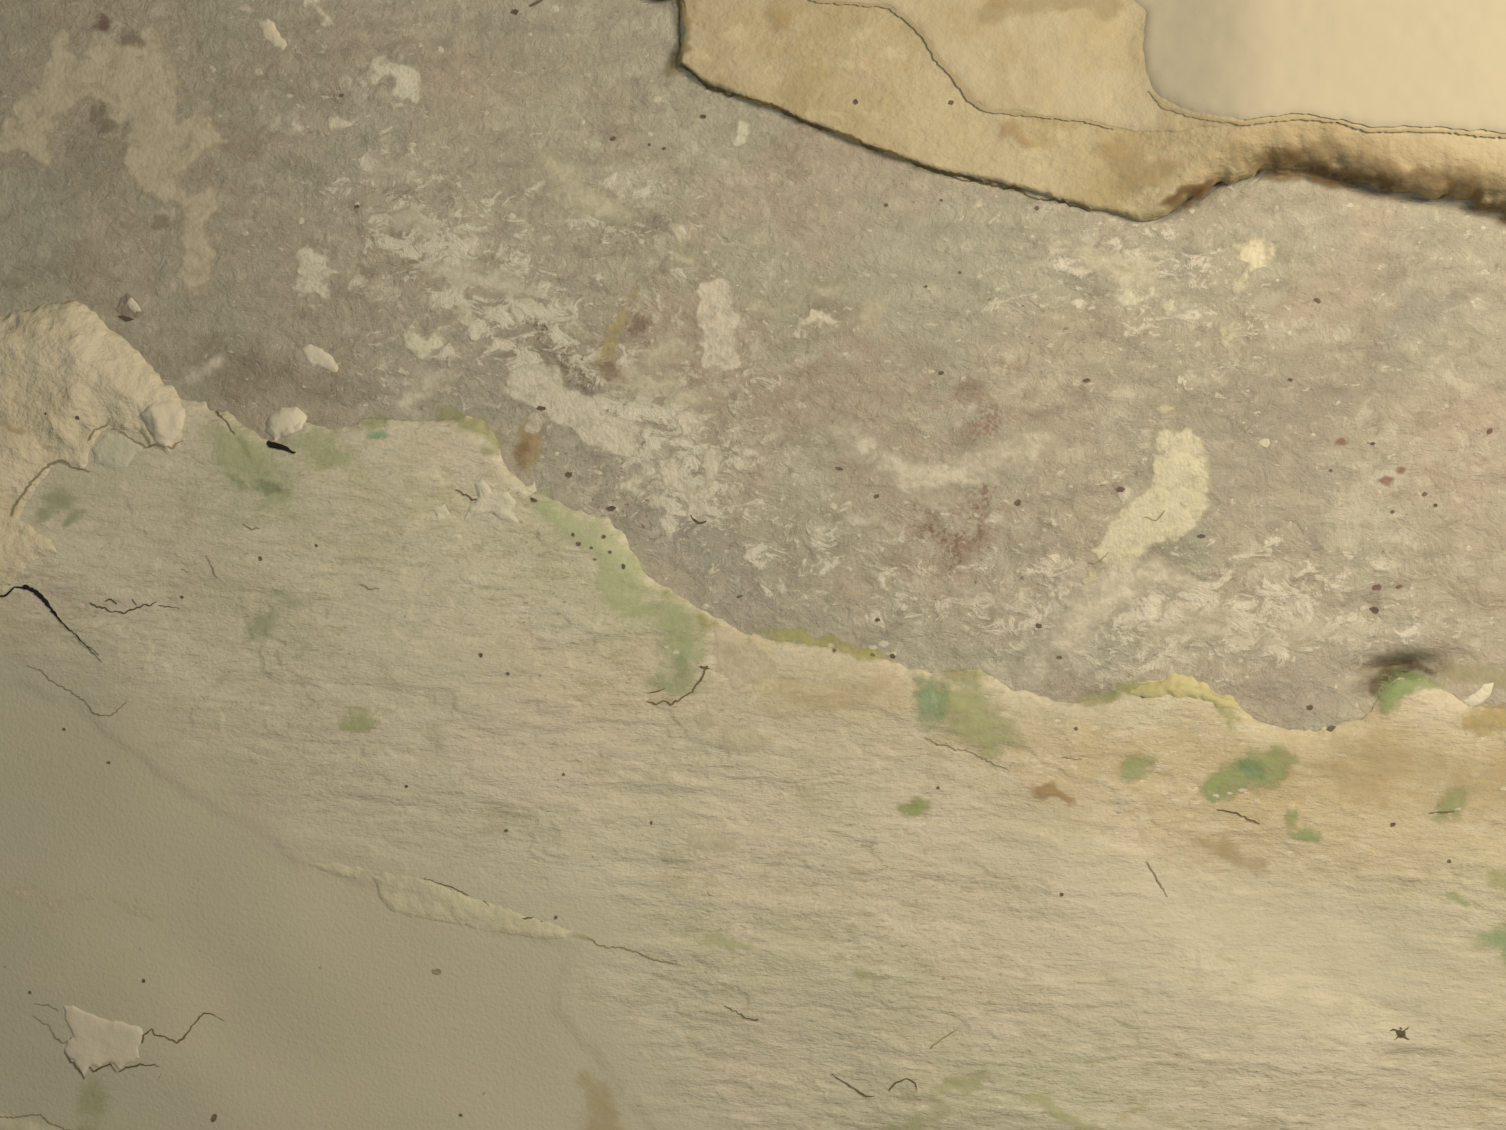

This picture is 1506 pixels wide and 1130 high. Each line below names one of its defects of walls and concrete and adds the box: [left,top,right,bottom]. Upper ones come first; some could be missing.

water stain [1163,178,1215,207]
water stain [1262,140,1506,220]
spalling [0,0,1506,732]
crack [0,585,179,663]
crack [647,666,710,706]
peeling [33,1003,223,1079]
crack [0,1114,70,1130]